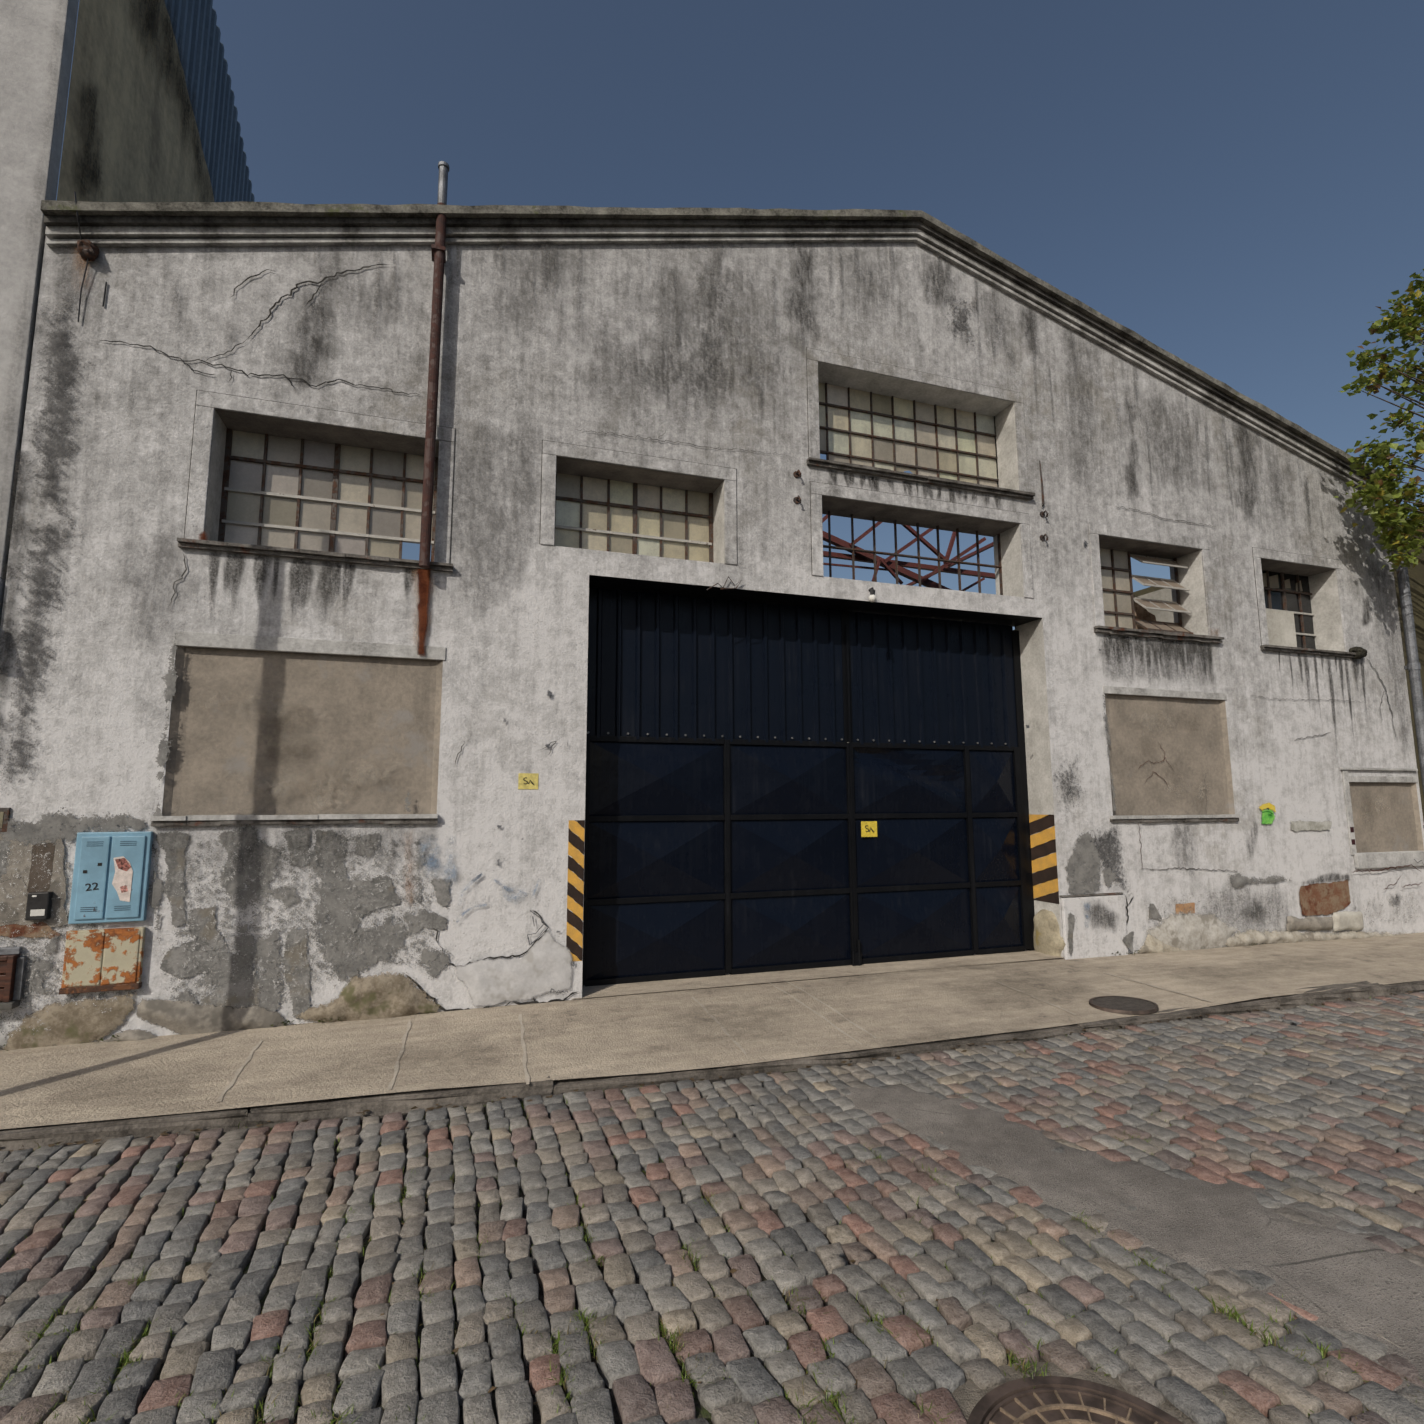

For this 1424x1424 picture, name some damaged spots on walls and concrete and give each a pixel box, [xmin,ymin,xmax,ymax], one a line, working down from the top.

crack [100,264,417,395]
water stain [926,268,980,346]
water stain [0,298,91,787]
water stain [210,551,355,604]
rust [417,568,431,655]
water stain [1104,634,1212,670]
water stain [1279,652,1365,723]
peeling [0,633,452,1050]
peeling [1065,832,1117,895]
crack [433,910,547,968]
flaking render [1122,873,1419,952]
crack [406,975,577,1012]